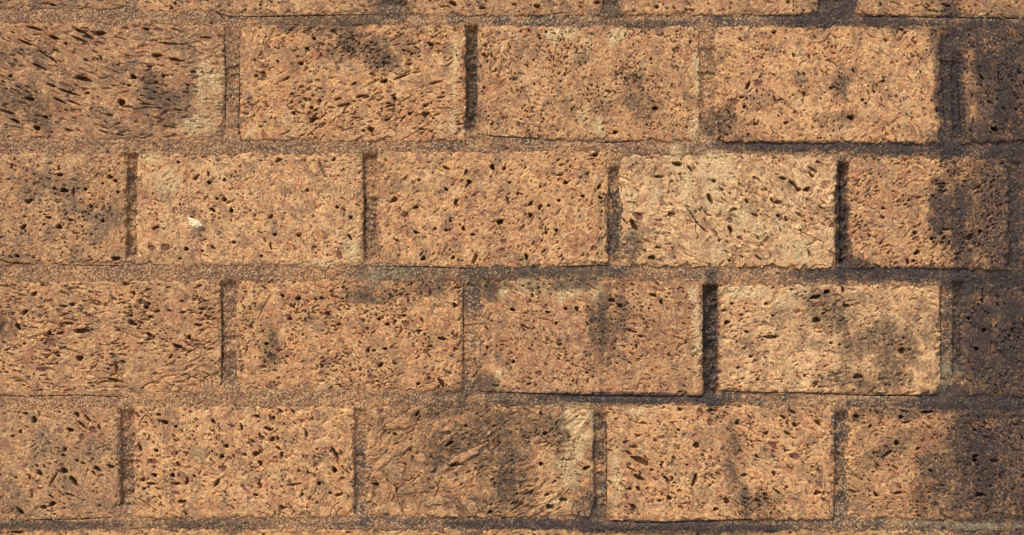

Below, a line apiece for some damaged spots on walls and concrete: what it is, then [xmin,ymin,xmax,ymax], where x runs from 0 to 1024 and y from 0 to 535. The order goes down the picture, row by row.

damp [411,0,1024,535]